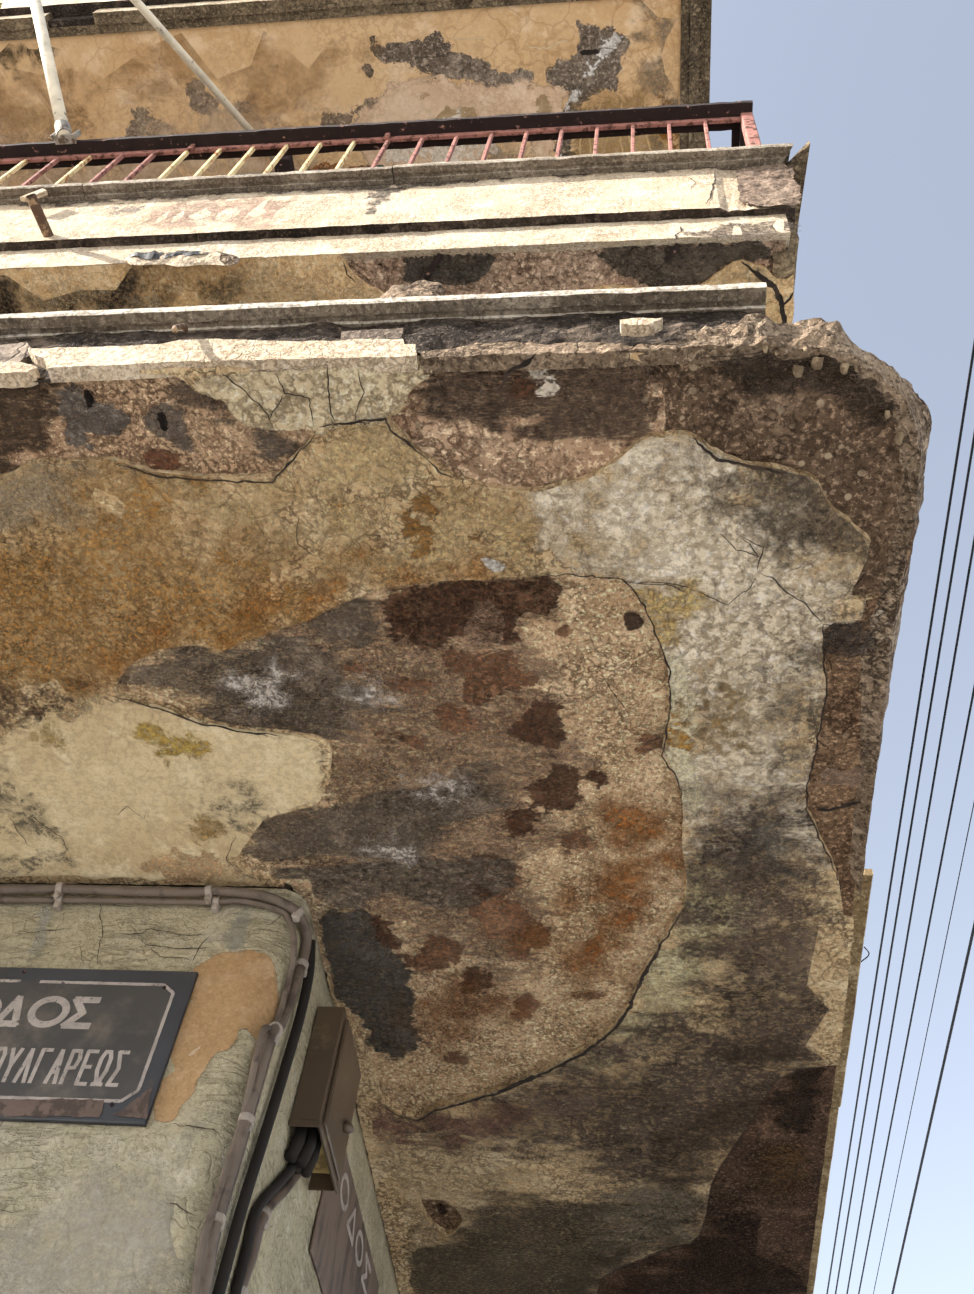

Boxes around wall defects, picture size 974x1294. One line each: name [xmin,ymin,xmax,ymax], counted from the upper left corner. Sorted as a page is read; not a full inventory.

peeling [320,20,630,126]
damp [0,266,161,314]
damp [199,269,323,305]
spalling [346,240,786,295]
crack [741,262,793,324]
spalling [0,377,314,475]
damp [0,462,321,747]
spalling [391,313,932,917]
damp [134,723,211,758]
spalling [0,572,687,1122]
damp [323,435,870,1294]
crack [17,904,211,965]